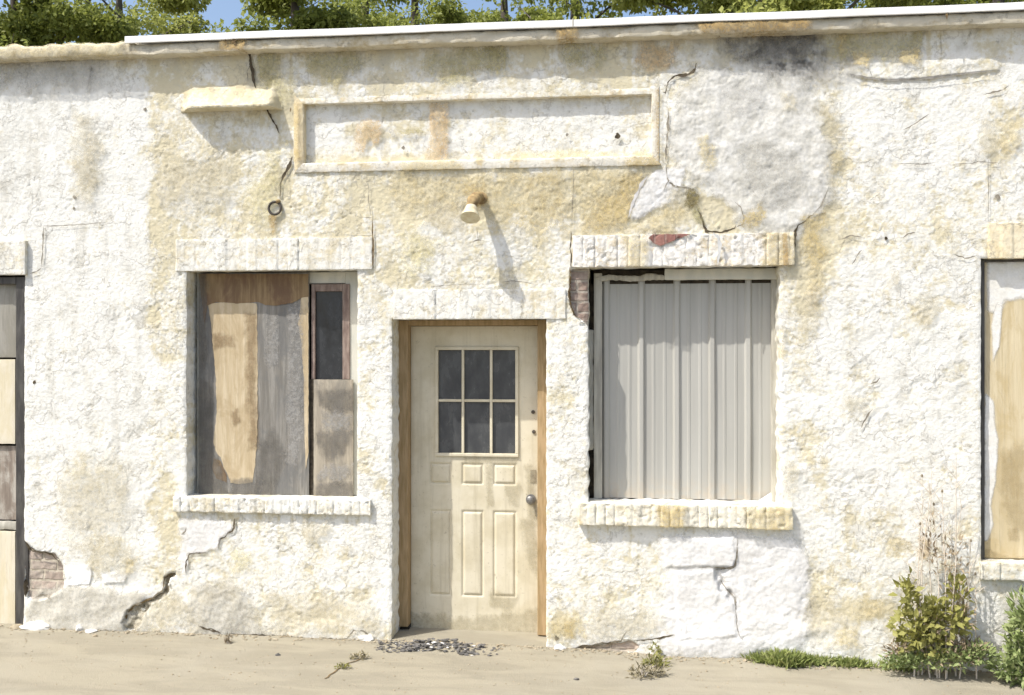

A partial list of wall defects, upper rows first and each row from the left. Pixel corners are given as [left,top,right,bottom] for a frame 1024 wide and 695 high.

crack [225,39,256,88]
leakage [751,30,923,87]
crack [279,157,292,197]
crack [663,65,744,263]
spalling [649,234,690,246]
crack [794,187,829,247]
spalling [567,268,771,330]
spalling [23,542,66,600]
crack [182,519,235,572]
crack [699,537,738,569]
spalling [122,573,176,631]